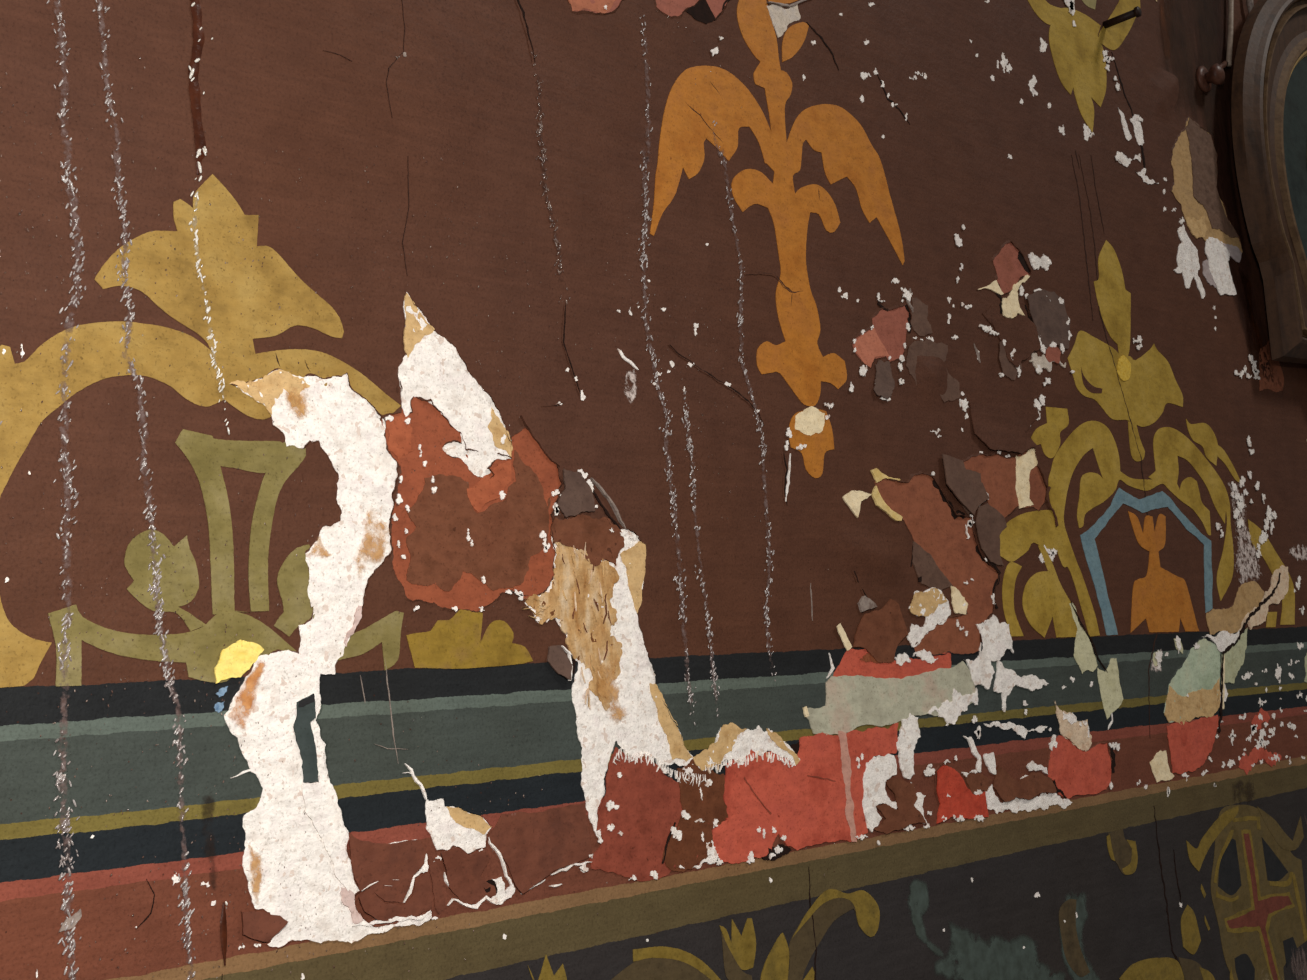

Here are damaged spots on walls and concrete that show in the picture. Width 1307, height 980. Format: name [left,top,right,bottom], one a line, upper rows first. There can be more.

crack [515,0,535,62]
peeling [654,0,731,56]
peeling [767,0,839,70]
peeling [860,68,910,125]
peeling [1102,50,1243,331]
water stain [47,0,86,674]
water stain [93,0,196,980]
peeling [214,240,1123,950]
water stain [637,15,720,725]
water stain [713,121,777,681]
peeling [1137,565,1307,797]
water stain [53,699,81,980]